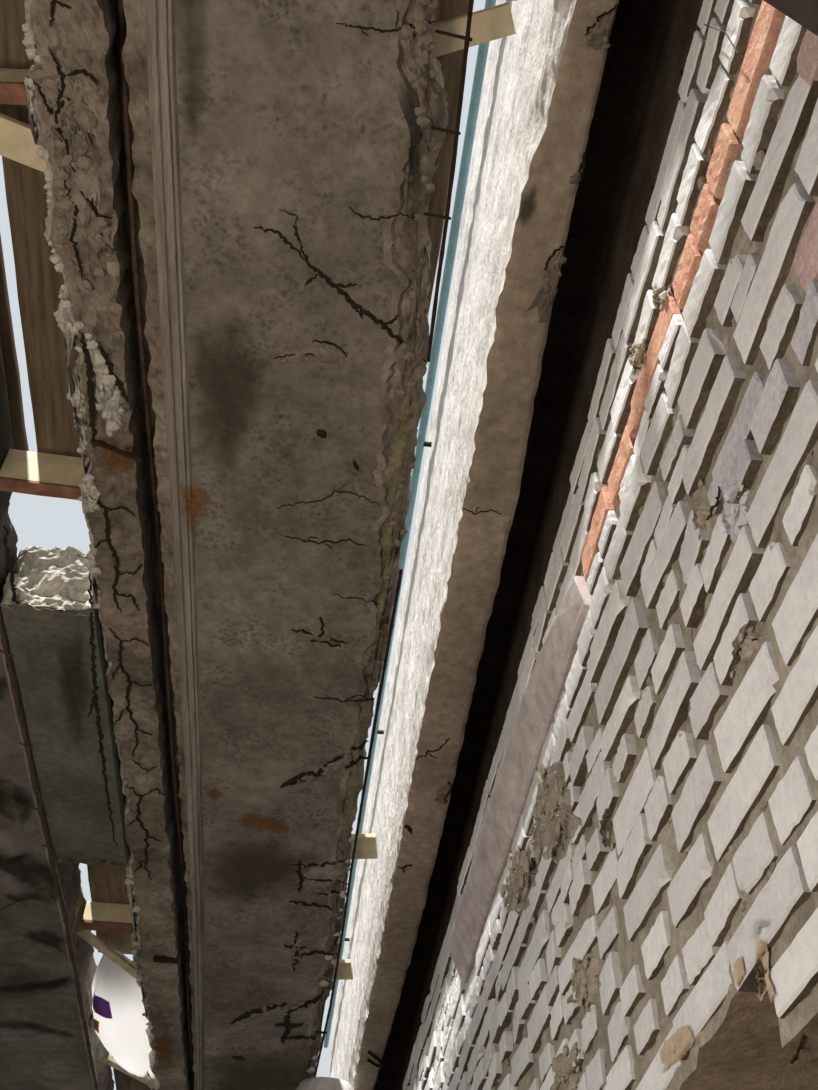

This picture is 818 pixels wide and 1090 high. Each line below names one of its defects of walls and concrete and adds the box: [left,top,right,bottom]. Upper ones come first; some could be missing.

crack [49,0,71,27]
crack [54,88,70,142]
crack [254,209,403,345]
crack [348,207,415,221]
spalling [3,525,20,604]
spalling [22,0,194,1090]
crack [87,497,165,880]
spalling [0,613,99,1090]